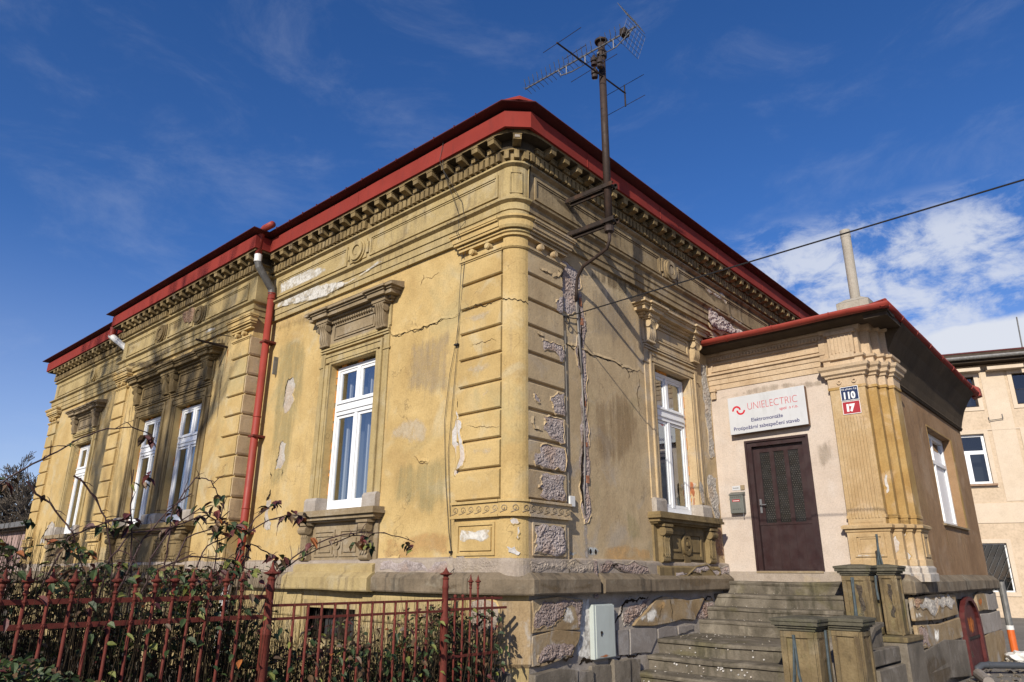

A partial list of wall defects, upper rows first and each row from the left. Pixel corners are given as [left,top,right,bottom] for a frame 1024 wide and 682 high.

crack [391,298,528,337]
spalling [704,286,743,335]
spalling [283,377,295,413]
crack [538,266,644,525]
spalling [275,441,286,471]
spalling [451,409,466,478]
spalling [533,391,567,502]
spalling [529,524,650,576]
spalling [532,594,599,630]
spalling [621,599,650,626]
spalling [913,593,955,649]
spalling [537,643,574,664]